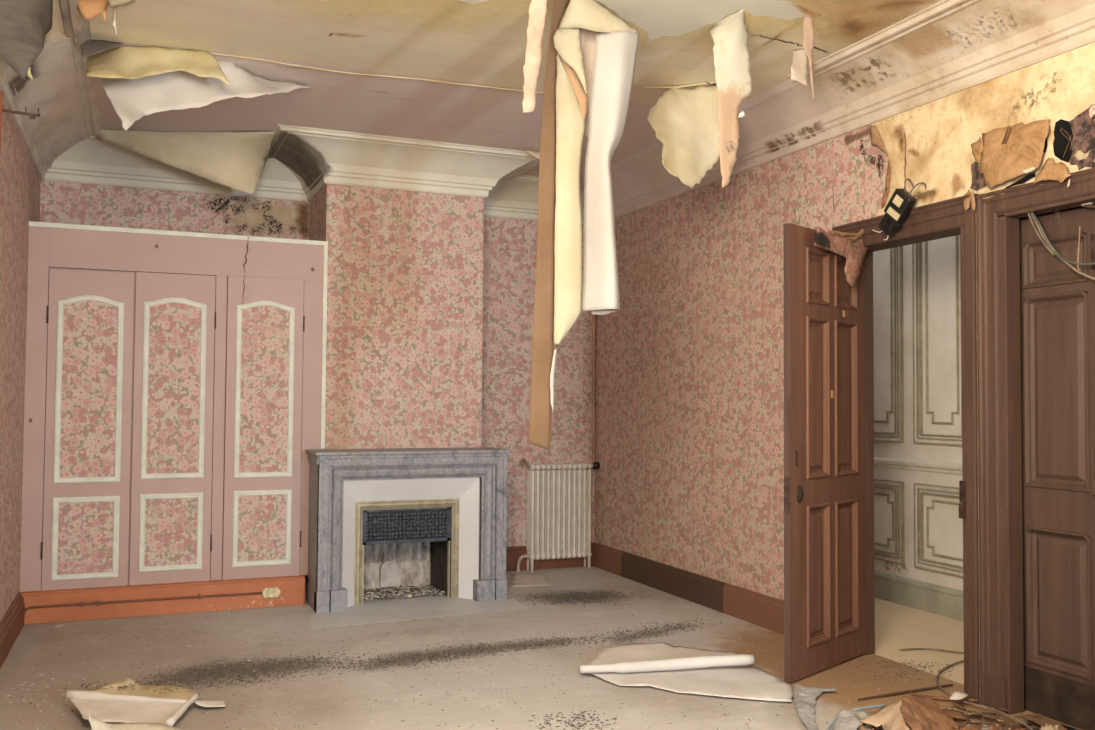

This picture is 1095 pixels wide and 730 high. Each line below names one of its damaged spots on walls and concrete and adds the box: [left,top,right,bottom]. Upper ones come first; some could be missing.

peeling [596,0,818,40]
damp [703,10,768,28]
damp [819,0,923,37]
damp [841,59,887,91]
peeling [870,42,1095,217]
damp [204,196,308,237]
peeling [814,226,869,288]